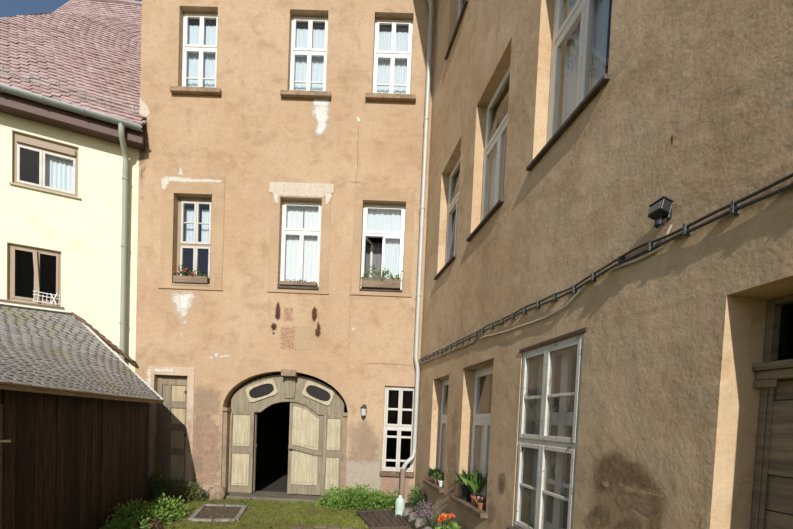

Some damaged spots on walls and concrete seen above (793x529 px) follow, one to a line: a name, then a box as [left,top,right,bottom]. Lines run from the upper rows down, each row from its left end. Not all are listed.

peeling [312,99,329,135]
peeling [172,293,196,324]
spalling [589,454,664,529]